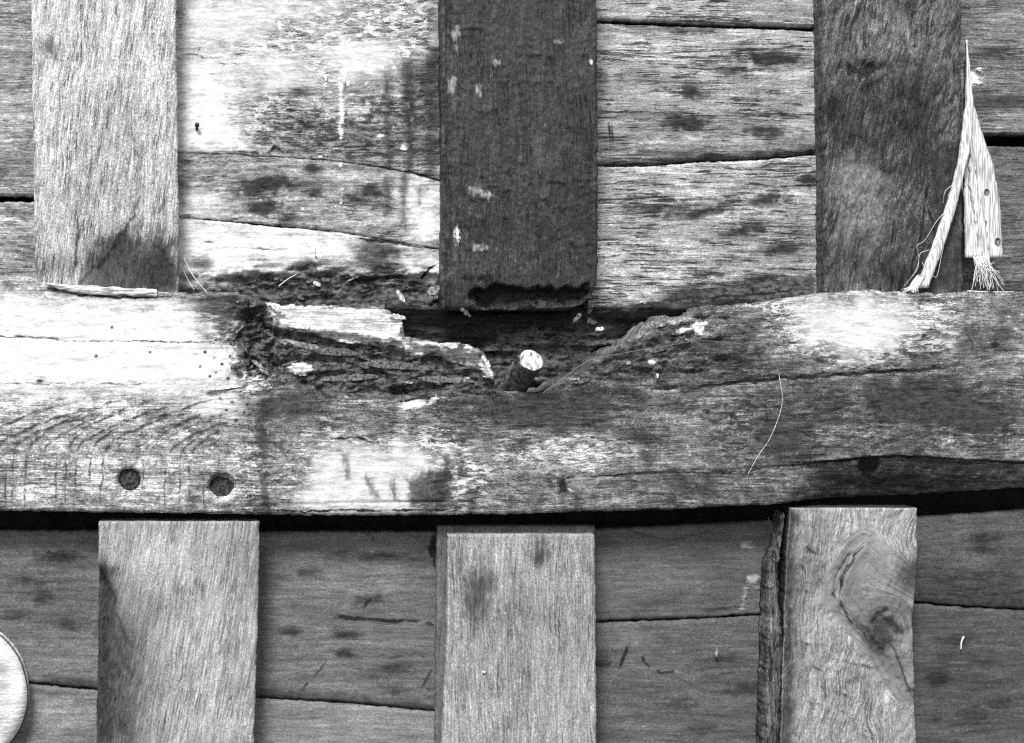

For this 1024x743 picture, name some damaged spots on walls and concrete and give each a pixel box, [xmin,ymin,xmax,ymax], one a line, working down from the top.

leakage [240,45,439,219]
leakage [225,175,325,220]
leakage [287,259,317,278]
spalling [229,241,497,405]
spalling [549,323,694,402]
crack [565,455,1024,490]